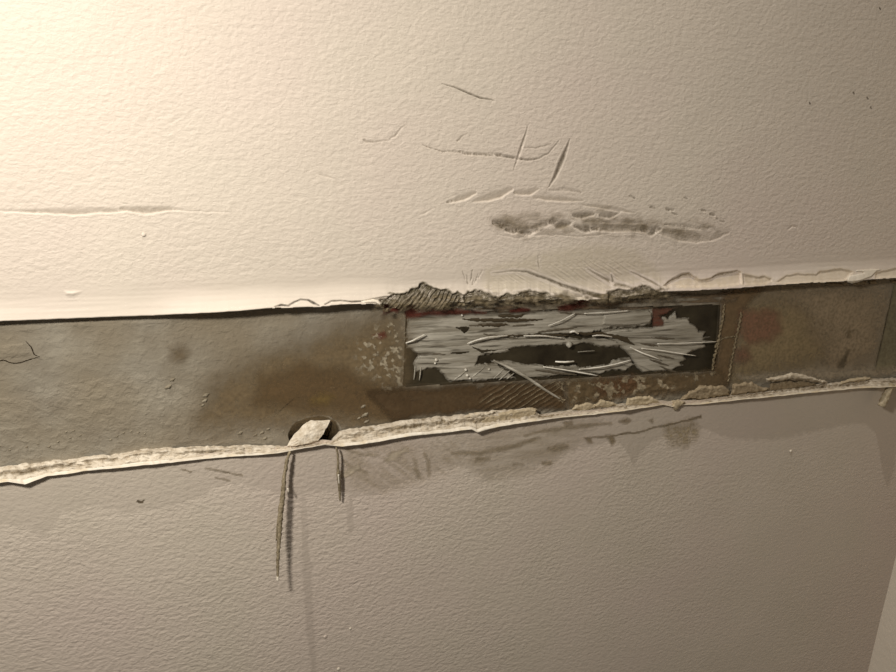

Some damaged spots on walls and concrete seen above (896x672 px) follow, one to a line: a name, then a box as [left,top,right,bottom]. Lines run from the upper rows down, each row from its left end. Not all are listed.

crack [0,202,231,219]
spalling [659,264,896,291]
peeling [272,294,396,308]
water stain [201,283,896,426]
spalling [0,372,896,484]